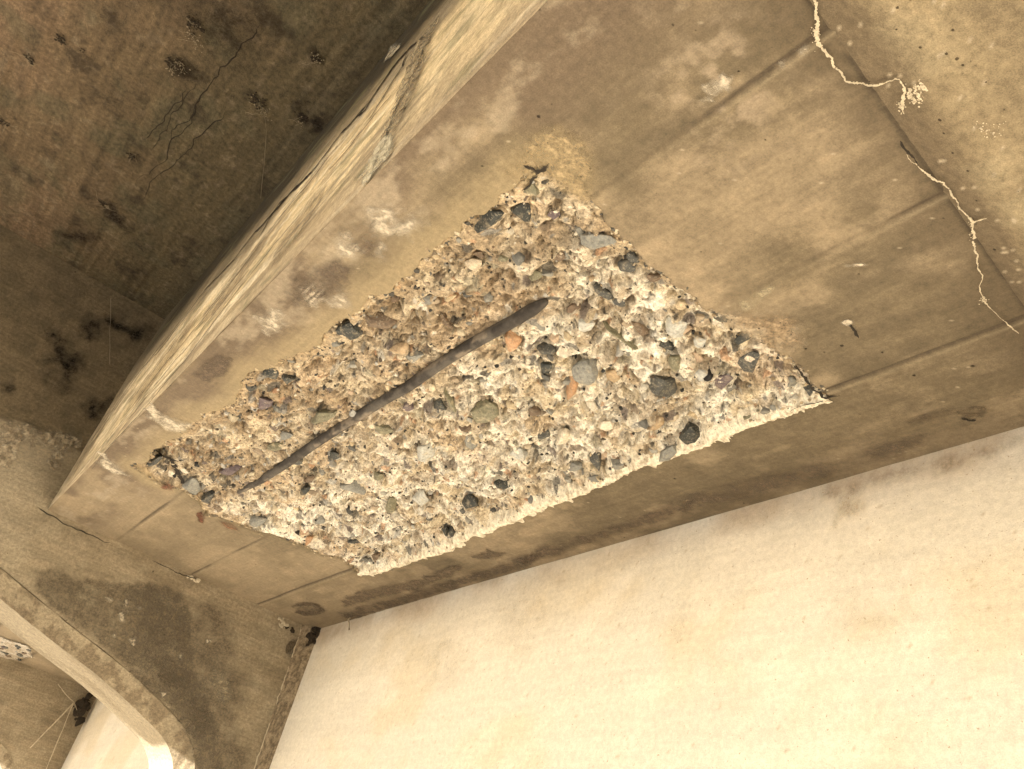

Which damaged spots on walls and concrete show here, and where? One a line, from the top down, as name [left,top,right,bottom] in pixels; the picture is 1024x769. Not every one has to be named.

crack [811,0,928,114]
crack [83,16,439,469]
crack [900,141,1019,334]
spalling [128,128,832,577]
water stain [342,466,829,618]
water stain [38,574,245,769]